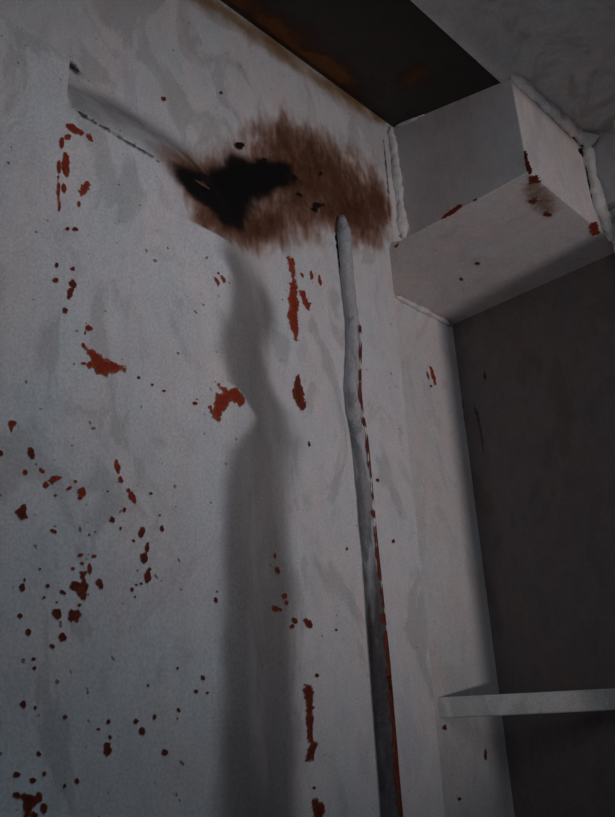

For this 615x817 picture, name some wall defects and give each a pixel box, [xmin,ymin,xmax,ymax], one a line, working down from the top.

corrosion [57,123,93,211]
corrosion [63,267,77,314]
corrosion [286,256,322,341]
corrosion [81,325,127,377]
corrosion [193,381,245,422]
corrosion [359,325,379,500]
corrosion [114,459,136,504]
corrosion [52,553,103,622]
corrosion [130,527,151,598]
corrosion [371,510,403,817]
corrosion [303,673,319,762]
corrosion [13,771,48,817]